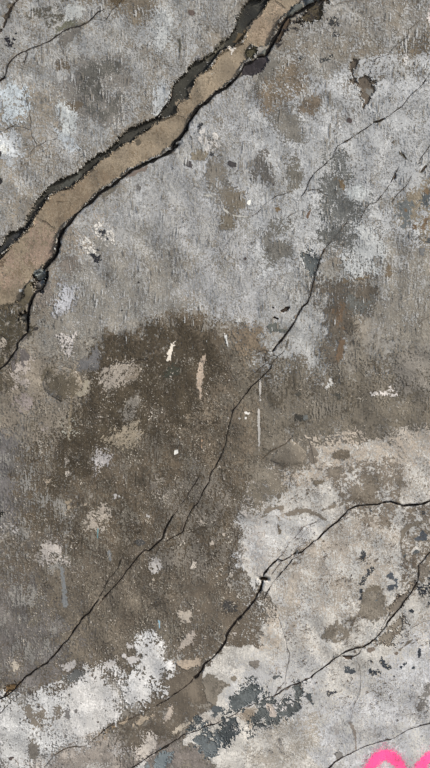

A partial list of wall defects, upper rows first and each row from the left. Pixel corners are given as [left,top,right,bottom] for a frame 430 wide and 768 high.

crack [0,0,318,369]
crack [252,78,427,217]